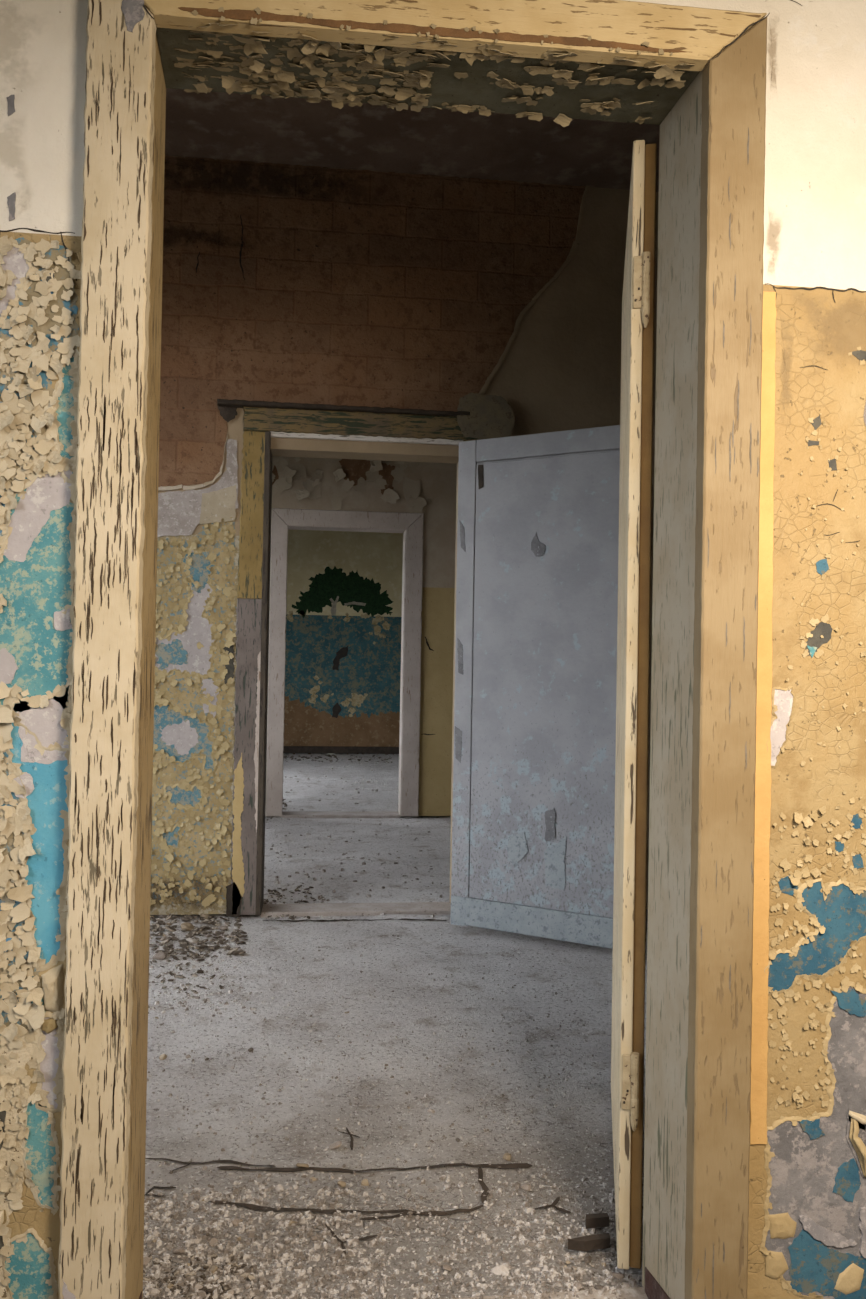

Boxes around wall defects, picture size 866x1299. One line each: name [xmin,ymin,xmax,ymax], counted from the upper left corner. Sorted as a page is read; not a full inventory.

peeling [174,7,695,127]
peeling [137,138,145,228]
spalling [158,156,590,491]
spalling [333,459,420,504]
peeling [0,192,142,1299]
peeling [150,514,238,907]
peeling [766,596,844,769]
peeling [759,791,866,1299]
crack [145,1128,532,1258]